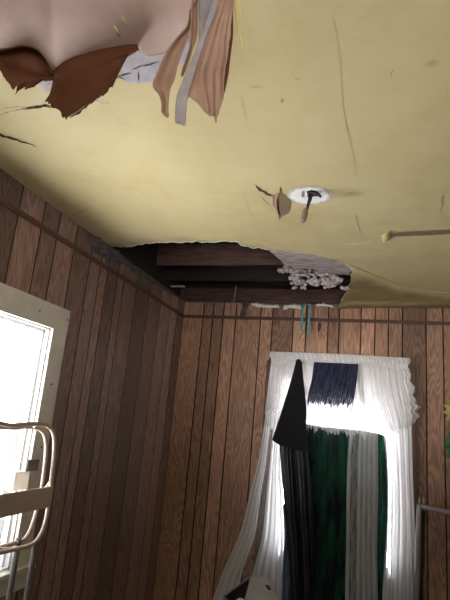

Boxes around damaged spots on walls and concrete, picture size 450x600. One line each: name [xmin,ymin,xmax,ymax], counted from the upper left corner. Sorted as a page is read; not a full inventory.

peeling [0,0,244,126]
crack [0,133,36,147]
crack [4,105,52,114]
spalling [84,230,182,300]